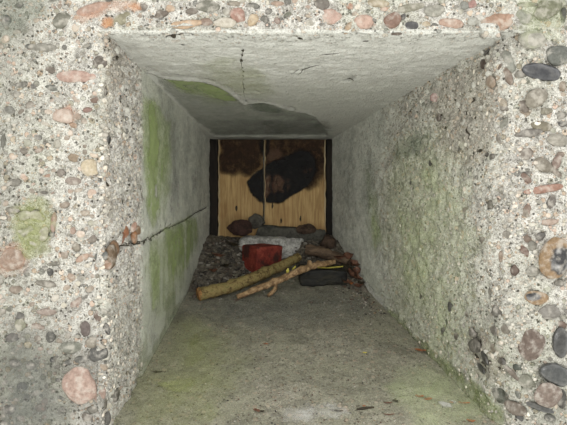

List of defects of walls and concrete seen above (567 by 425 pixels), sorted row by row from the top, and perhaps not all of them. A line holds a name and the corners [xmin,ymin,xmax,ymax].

damp [148,68,294,111]
crack [119,207,206,248]